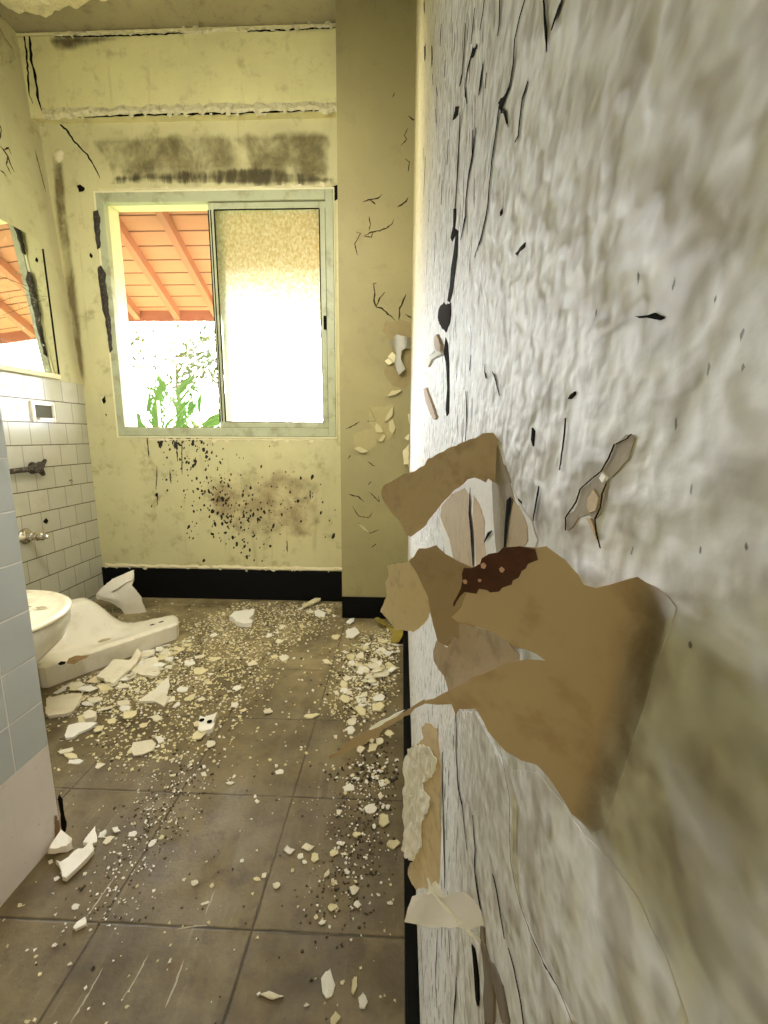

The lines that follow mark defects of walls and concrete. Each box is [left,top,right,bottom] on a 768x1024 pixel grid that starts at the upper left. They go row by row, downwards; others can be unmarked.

peeling [53,21,336,39]
crack [247,25,336,33]
crack [24,32,334,178]
peeling [42,101,337,121]
water stain [116,136,326,185]
crack [447,0,563,302]
crack [373,283,412,319]
crack [443,337,500,441]
water stain [147,438,335,562]
peeling [329,319,677,835]
peeling [401,722,511,1024]
crack [442,752,524,1024]